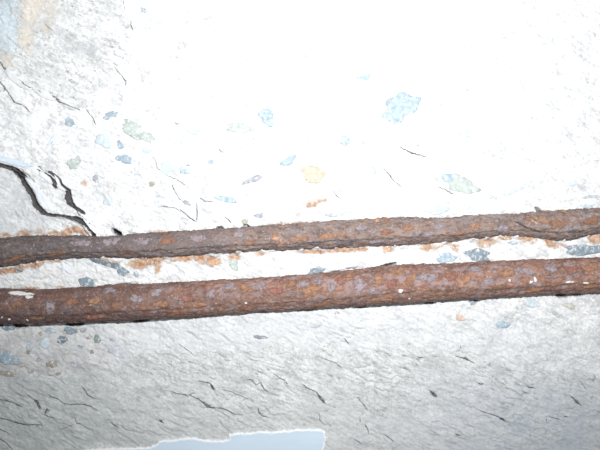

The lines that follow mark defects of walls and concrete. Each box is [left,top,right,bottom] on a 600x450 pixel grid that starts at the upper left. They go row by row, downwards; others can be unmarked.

spalling [0,0,600,238]
crack [0,163,96,237]
rust [130,257,164,272]
rust [172,255,221,267]
spalling [0,233,600,290]
spalling [0,293,600,379]
crack [0,388,96,449]
crack [171,391,232,413]
peeling [85,428,328,450]
crack [249,371,326,423]